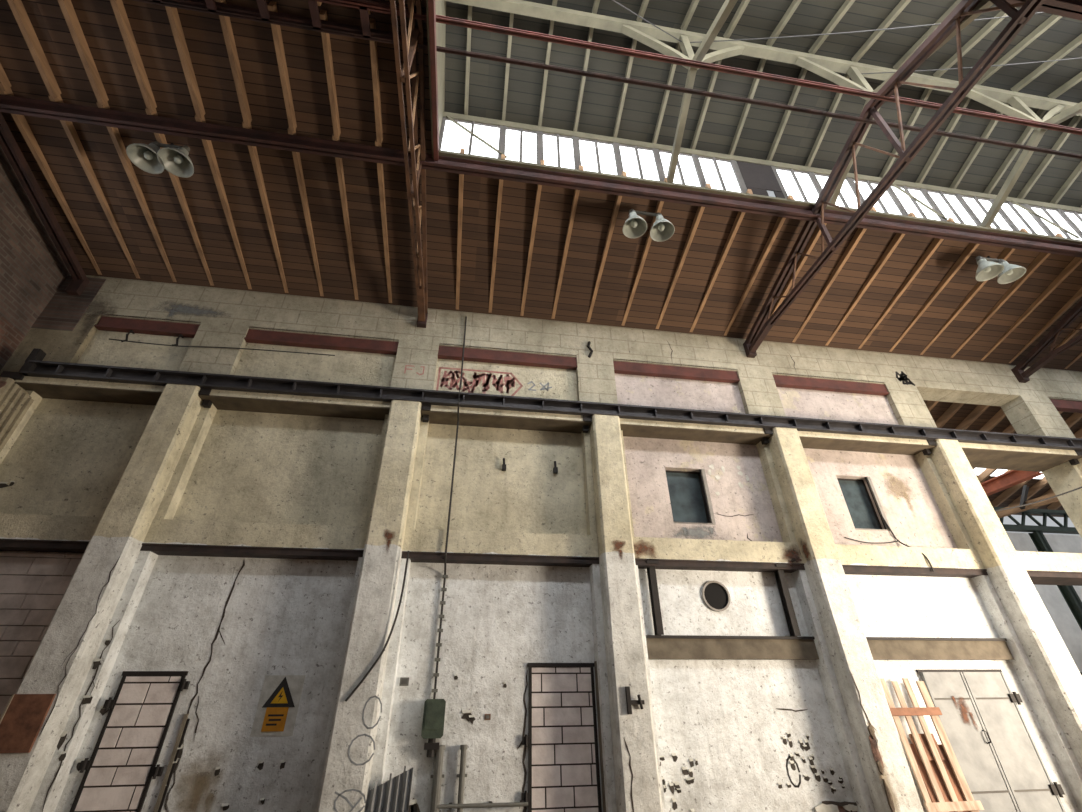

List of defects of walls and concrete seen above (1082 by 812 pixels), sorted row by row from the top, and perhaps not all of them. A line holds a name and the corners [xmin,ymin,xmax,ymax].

corrosion [613,541,654,558]
crack [164,561,245,812]
leakage [181,772,218,812]
peeling [782,732,858,812]